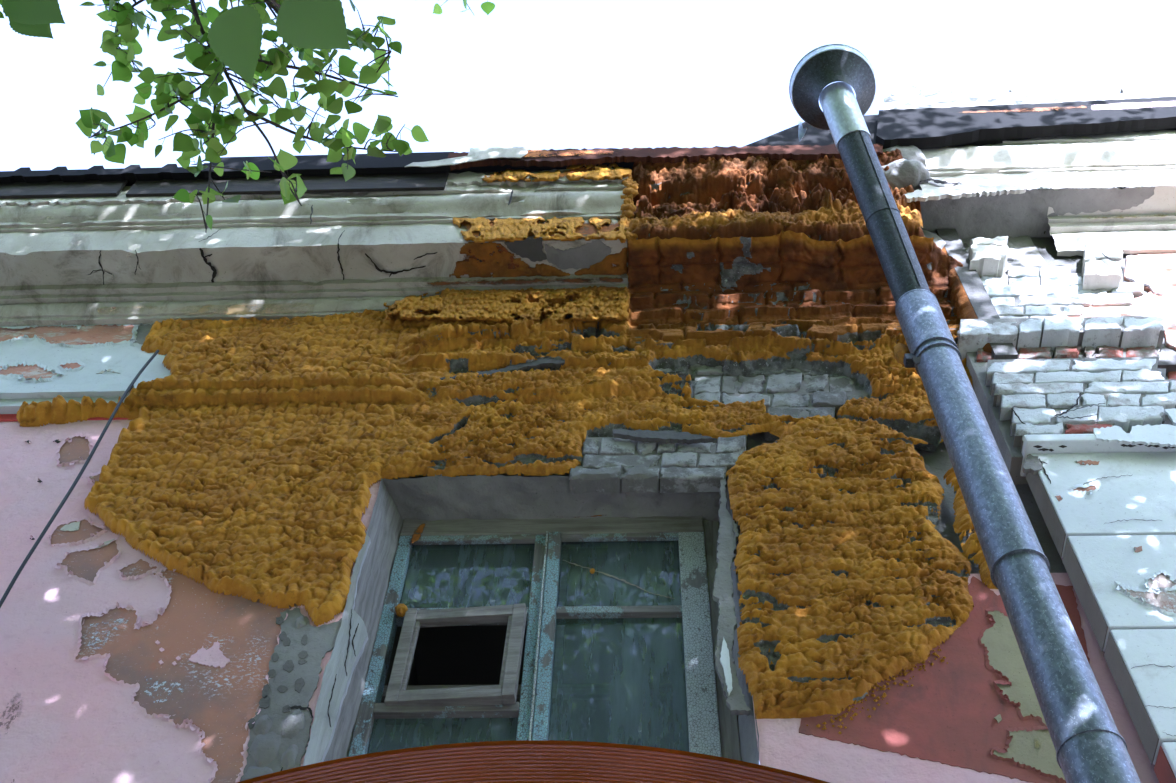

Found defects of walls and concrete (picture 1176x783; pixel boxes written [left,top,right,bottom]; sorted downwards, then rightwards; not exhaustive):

spalling [0,191,180,208]
crack [89,250,140,285]
crack [199,229,221,283]
crack [337,230,438,280]
spalling [445,153,894,307]
peeling [0,323,154,384]
spalling [655,364,868,424]
spalling [957,265,1176,475]
spalling [569,435,750,716]
peeling [30,516,342,783]
flaking render [799,576,1066,783]
flaking render [1055,584,1090,664]